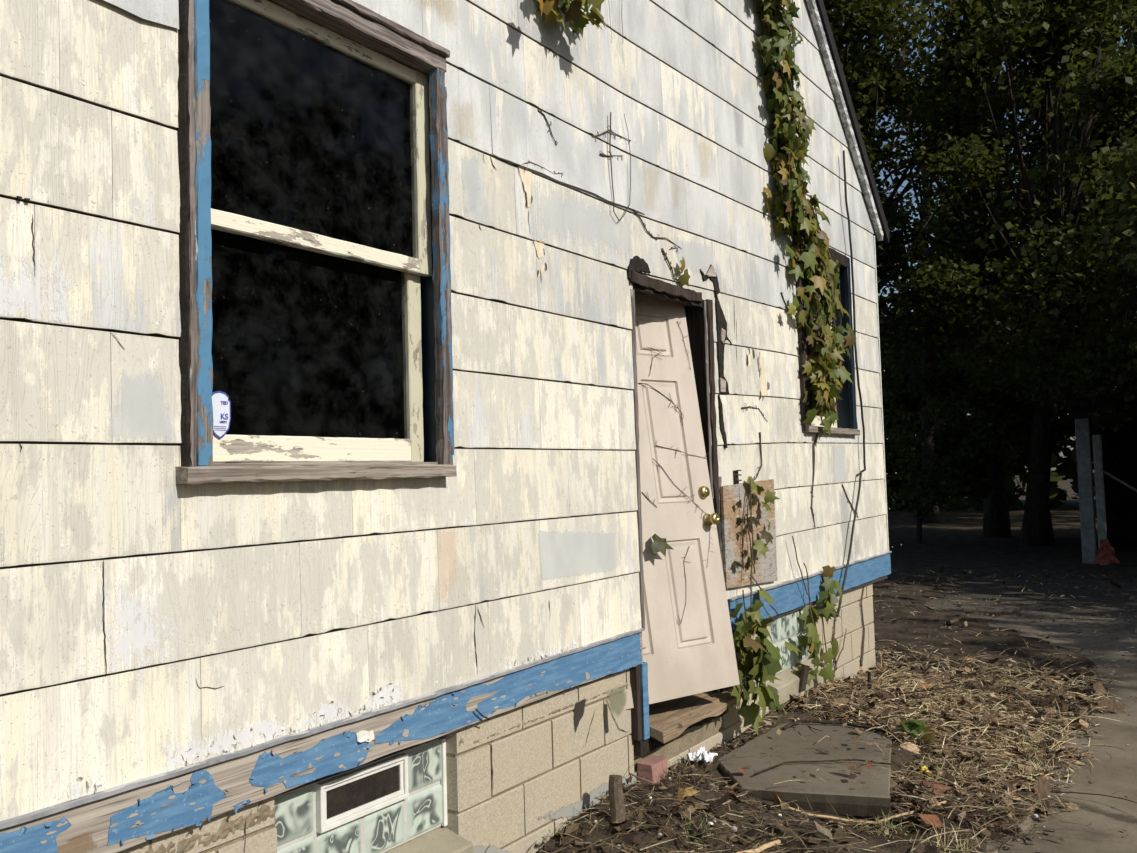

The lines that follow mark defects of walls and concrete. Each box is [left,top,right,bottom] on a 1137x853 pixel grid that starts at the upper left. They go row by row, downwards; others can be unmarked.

peeling [518,166,533,207]
peeling [533,237,547,281]
peeling [0,254,79,331]
peeling [746,347,770,401]
peeling [96,574,180,681]
peeling [107,633,643,846]
peeling [70,777,102,800]
peeling [0,816,71,853]